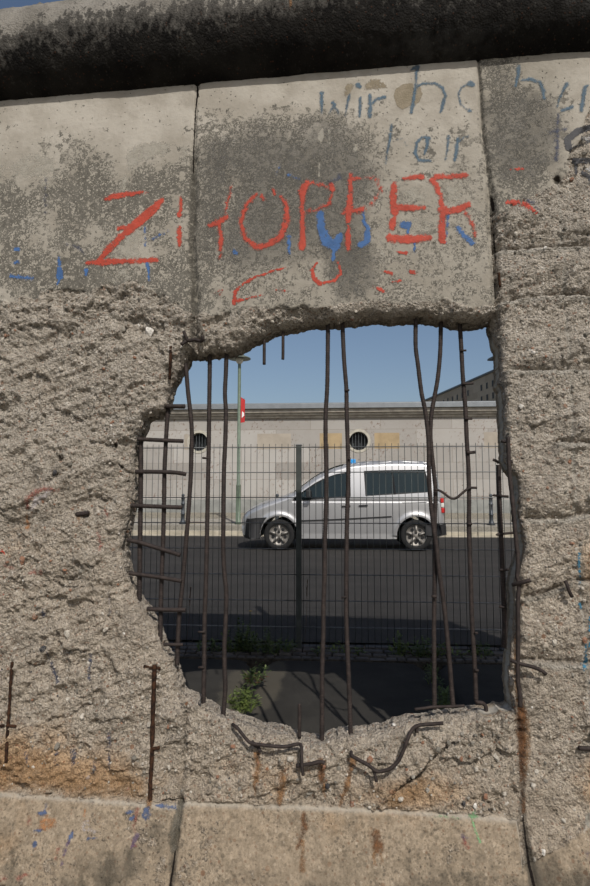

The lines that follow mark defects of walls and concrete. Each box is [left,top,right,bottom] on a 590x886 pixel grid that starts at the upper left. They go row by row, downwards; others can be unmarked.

peeling [364,79,423,109]
crack [192,86,200,174]
spalling [194,130,590,862]
spalling [0,268,527,865]
rust [514,633,529,784]
rust [318,759,326,796]
rust [339,757,356,806]
crack [384,747,447,800]
crack [168,852,176,886]
crack [522,815,535,886]